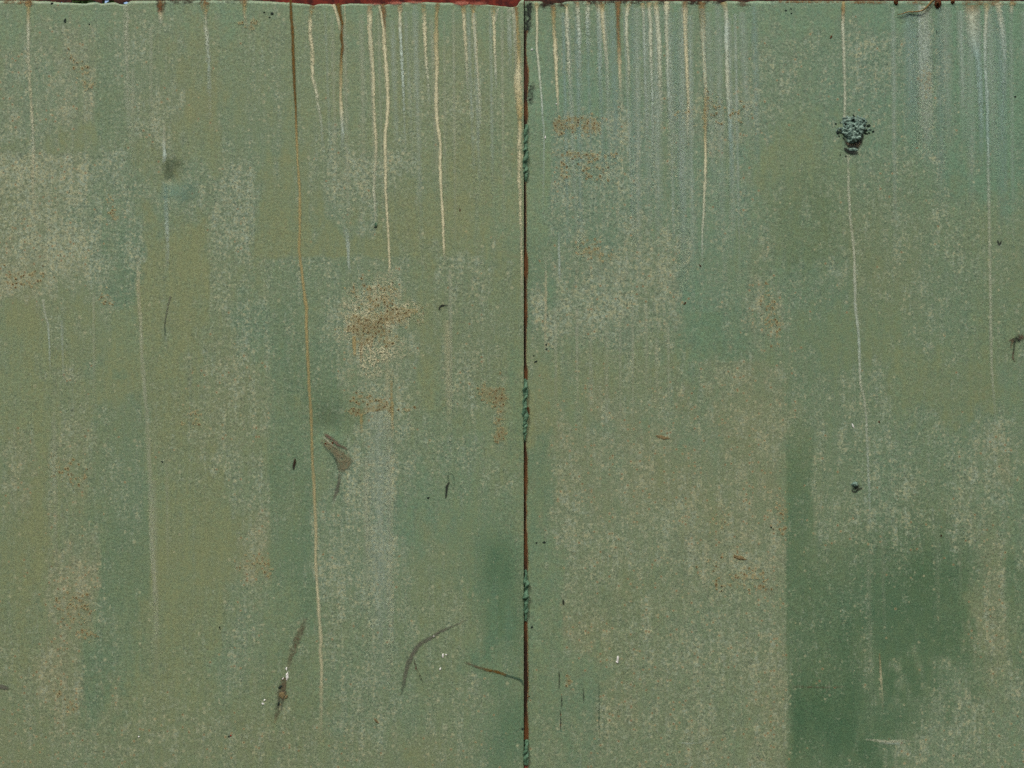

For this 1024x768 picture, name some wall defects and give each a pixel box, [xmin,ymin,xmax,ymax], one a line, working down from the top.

water stain [332,3,345,134]
water stain [341,4,417,376]
rust [344,277,424,359]
water stain [422,3,445,251]
water stain [551,1,708,249]
water stain [721,1,743,149]
water stain [847,159,869,462]
water stain [960,2,1014,248]